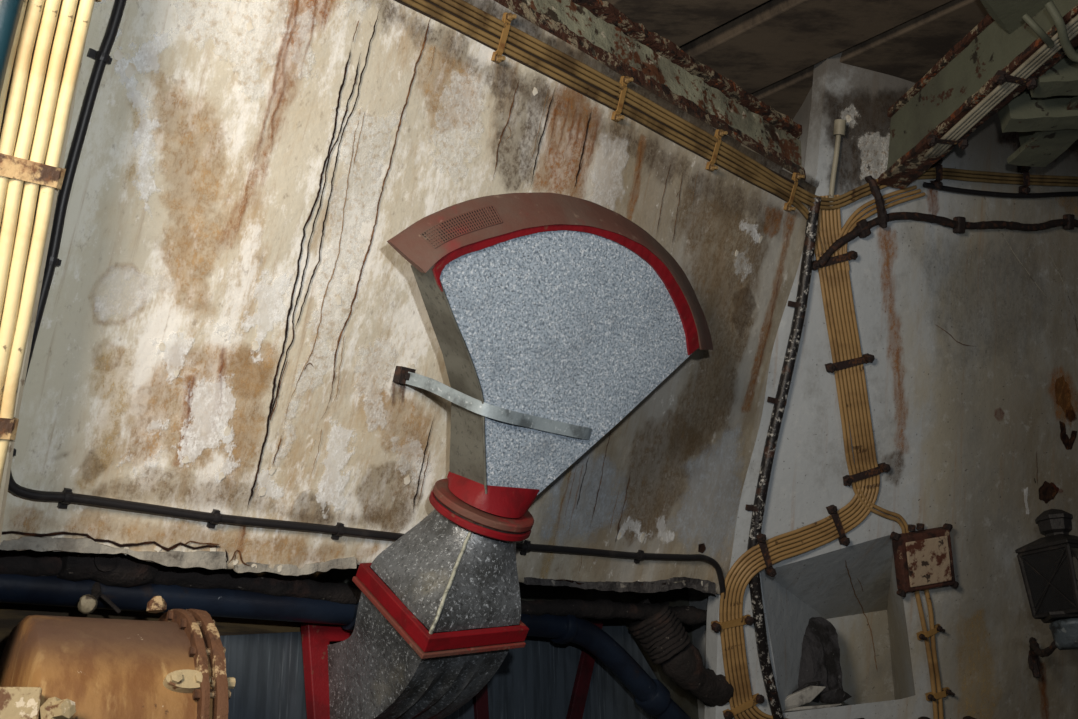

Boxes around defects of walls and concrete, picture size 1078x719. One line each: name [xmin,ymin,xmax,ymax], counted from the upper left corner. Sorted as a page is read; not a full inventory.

leakage [157,92,222,306]
corrosion [260,0,333,165]
crack [494,81,554,181]
corrosion [535,90,597,196]
crack [575,113,591,186]
peeling [858,132,888,180]
crack [248,12,435,509]
leakage [129,345,273,471]
leakage [544,177,782,555]
spalling [1055,376,1077,450]
crack [2,531,250,566]
leakage [352,467,420,532]